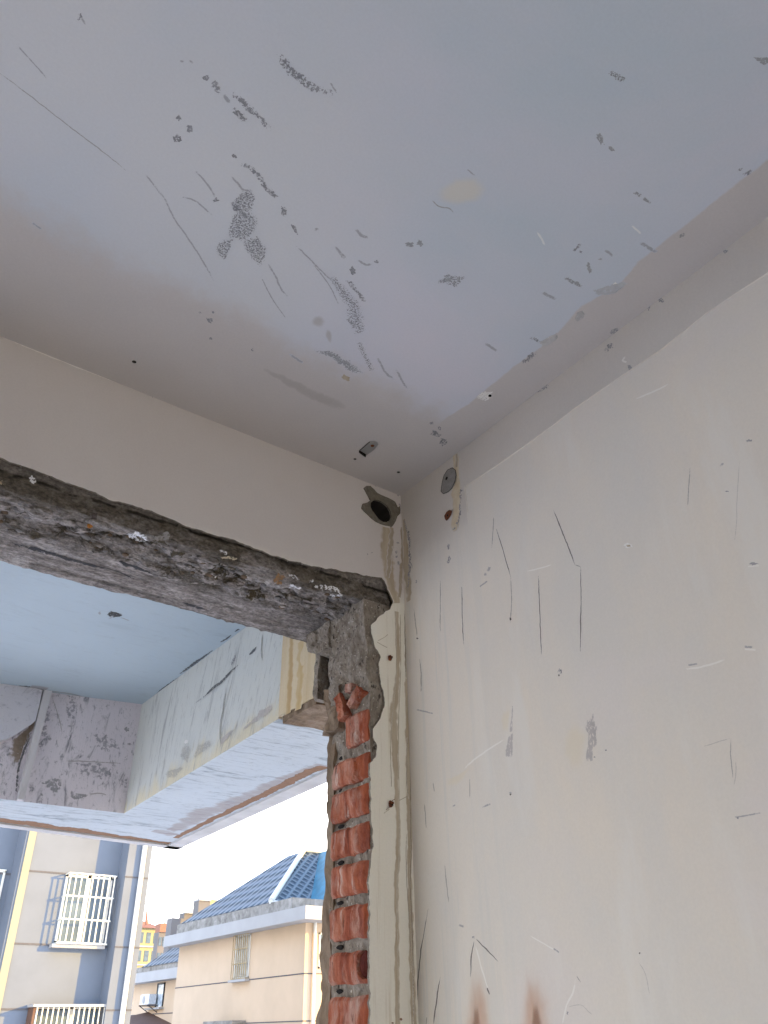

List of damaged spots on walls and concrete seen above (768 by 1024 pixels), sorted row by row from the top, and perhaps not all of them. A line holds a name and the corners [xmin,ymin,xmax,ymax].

crack [0,73,126,171]
spalling [245,588,265,601]
crack [491,517,512,623]
crack [553,510,582,652]
spalling [561,714,607,774]
corrosion [463,963,495,1024]
corrosion [516,963,556,1024]